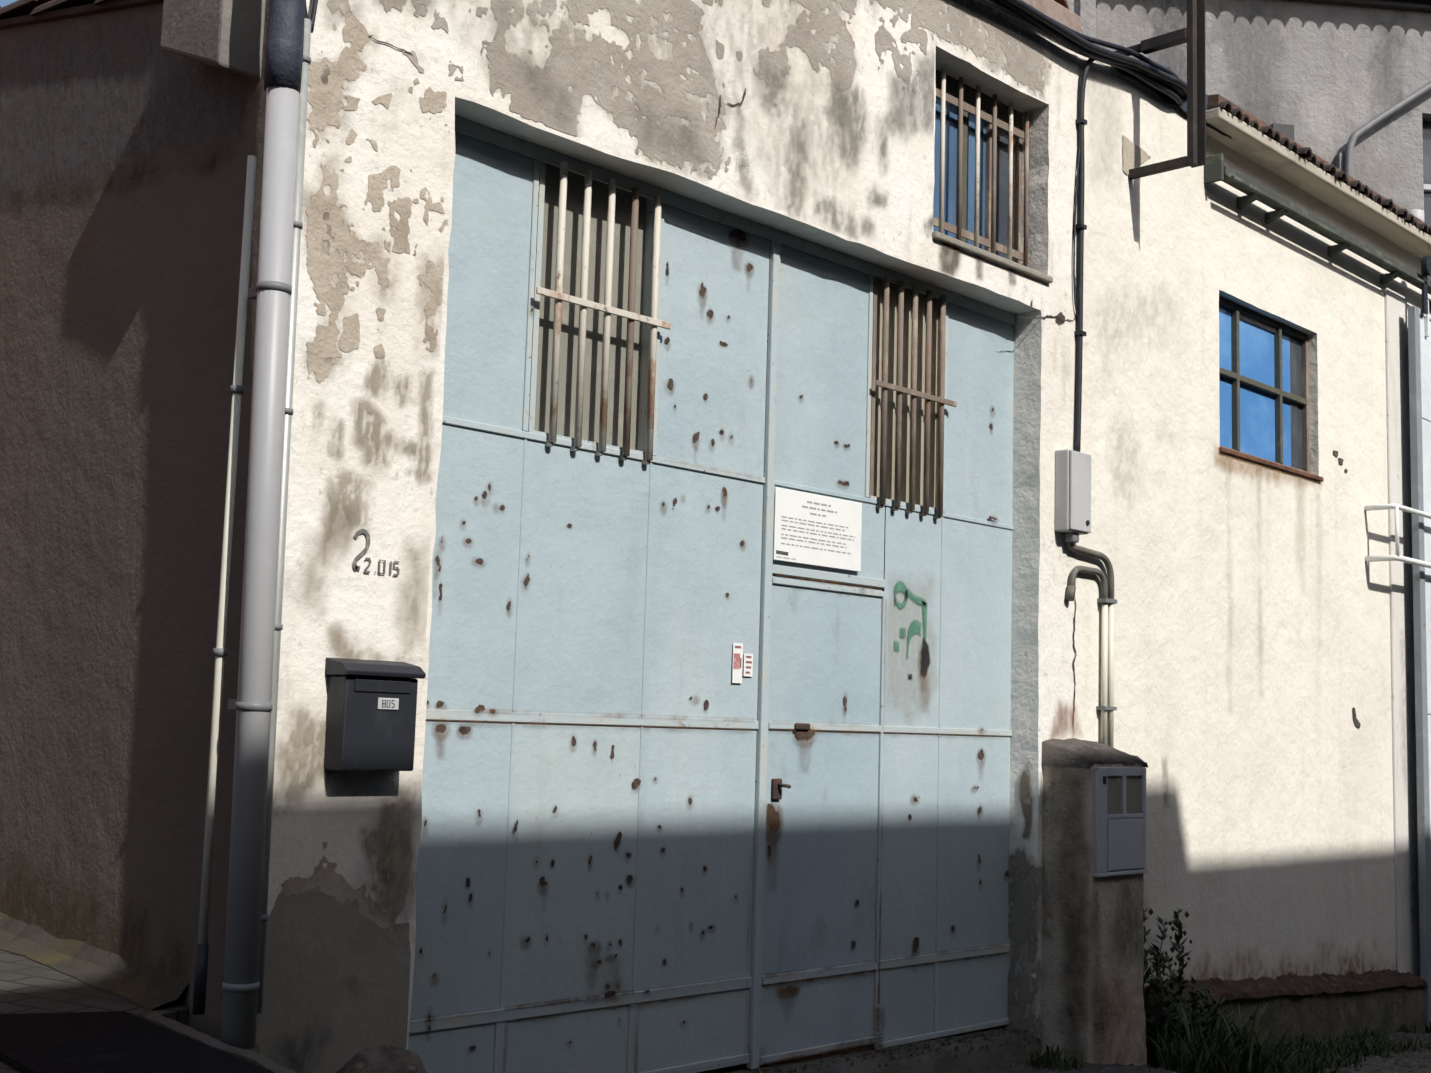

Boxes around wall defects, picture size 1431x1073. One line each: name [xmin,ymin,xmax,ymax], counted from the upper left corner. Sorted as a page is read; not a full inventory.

peeling [403,51,464,126]
peeling [469,0,1051,179]
peeling [302,0,449,479]
corrosion [941,242,960,275]
peeling [331,475,361,525]
corrosion [436,704,496,734]
corrosion [797,729,815,739]
corrosion [767,803,780,857]
peeling [256,804,411,1073]
corrosion [766,904,881,1026]